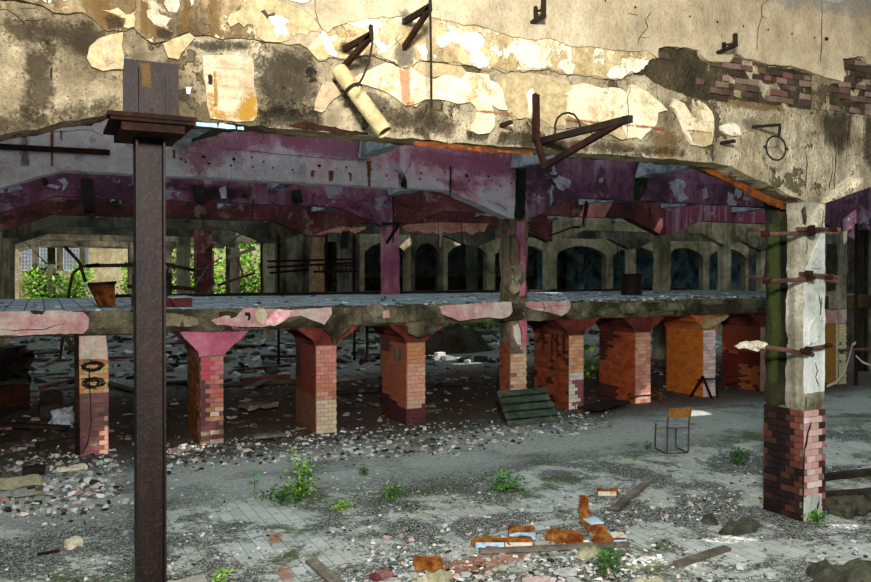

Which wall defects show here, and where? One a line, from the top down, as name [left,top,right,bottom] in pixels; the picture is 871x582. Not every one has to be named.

damp [141,0,172,39]
damp [0,0,122,165]
rust [141,64,151,87]
damp [186,0,321,174]
flaking render [1,0,871,147]
damp [369,95,455,137]
spalling [413,141,533,155]
damp [824,111,854,154]
damp [863,116,871,166]
peeling [549,175,571,206]
spalling [699,166,787,209]
flaking render [211,222,685,345]